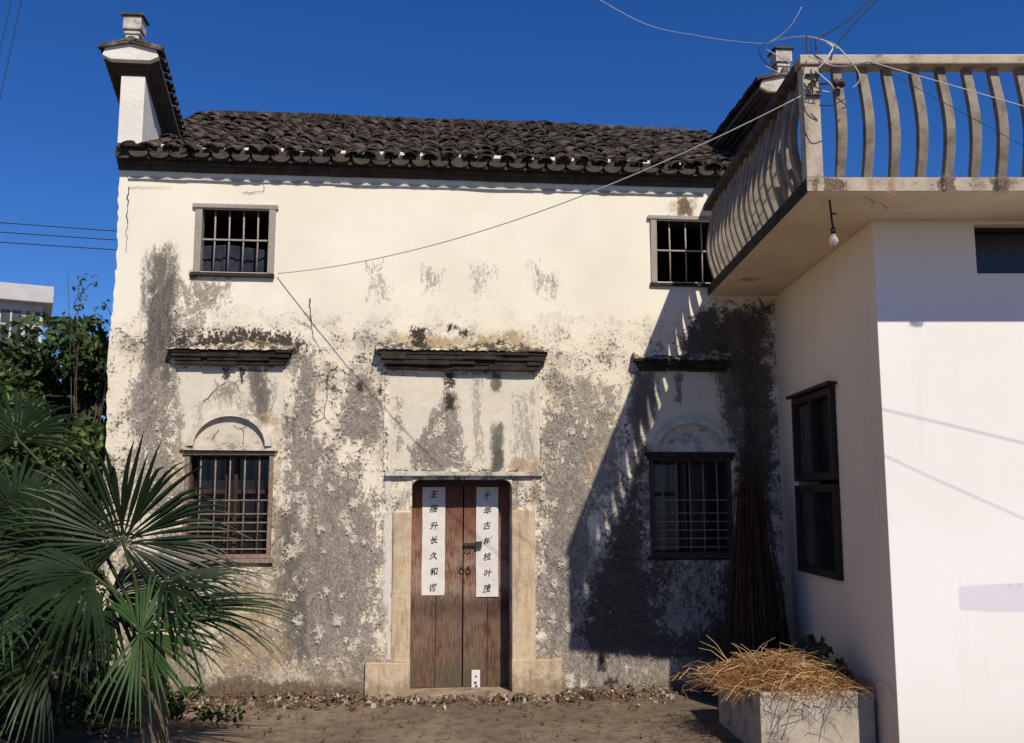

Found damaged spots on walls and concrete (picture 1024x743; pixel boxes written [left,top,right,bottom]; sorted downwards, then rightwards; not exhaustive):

damp [141,244,309,381]
damp [407,322,433,348]
damp [441,370,459,389]
damp [490,371,502,391]
damp [490,423,504,470]
damp [627,370,659,443]
damp [710,366,747,454]
peeling [272,340,472,681]